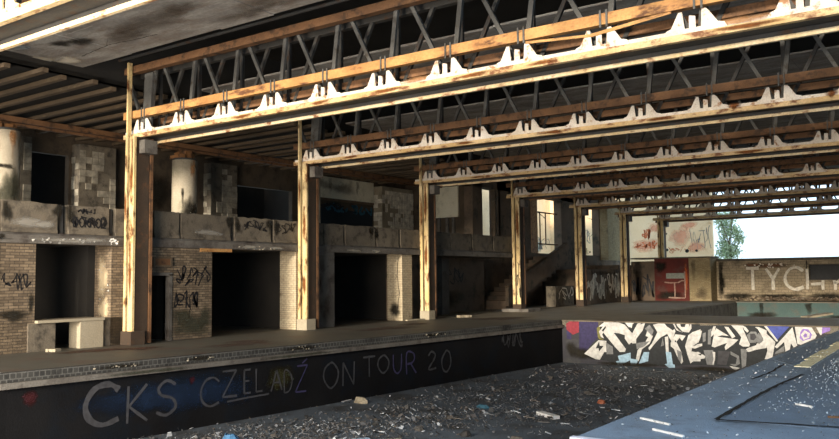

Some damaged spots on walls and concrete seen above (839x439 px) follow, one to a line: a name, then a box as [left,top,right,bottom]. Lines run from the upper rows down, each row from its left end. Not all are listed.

rust [717,13,774,31]
rust [376,76,427,93]